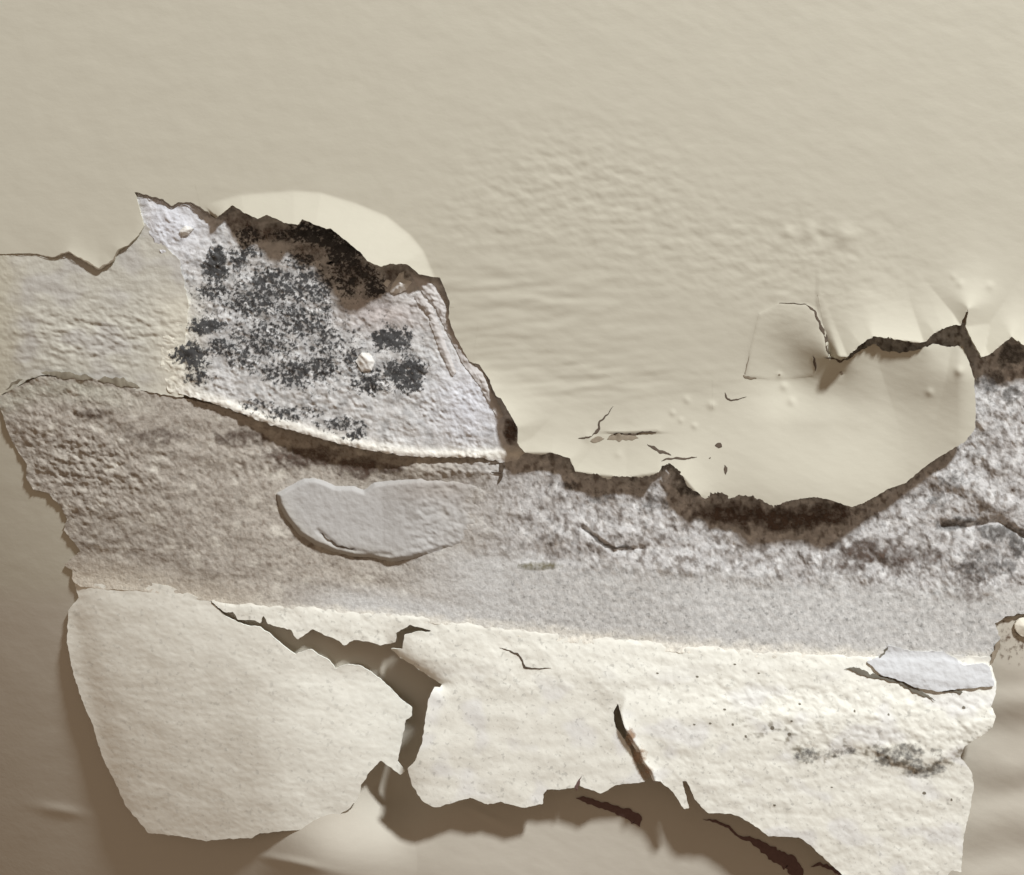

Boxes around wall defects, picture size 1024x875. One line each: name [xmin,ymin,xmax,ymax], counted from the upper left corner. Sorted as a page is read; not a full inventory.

leakage [168,215,429,441]
leakage [981,344,1023,400]
leakage [268,449,402,479]
leakage [504,420,518,444]
crack [579,408,727,474]
peeling [0,179,1024,875]
leakage [699,502,856,531]
leakage [835,540,915,570]
leakage [939,516,1024,578]
crack [502,648,547,669]